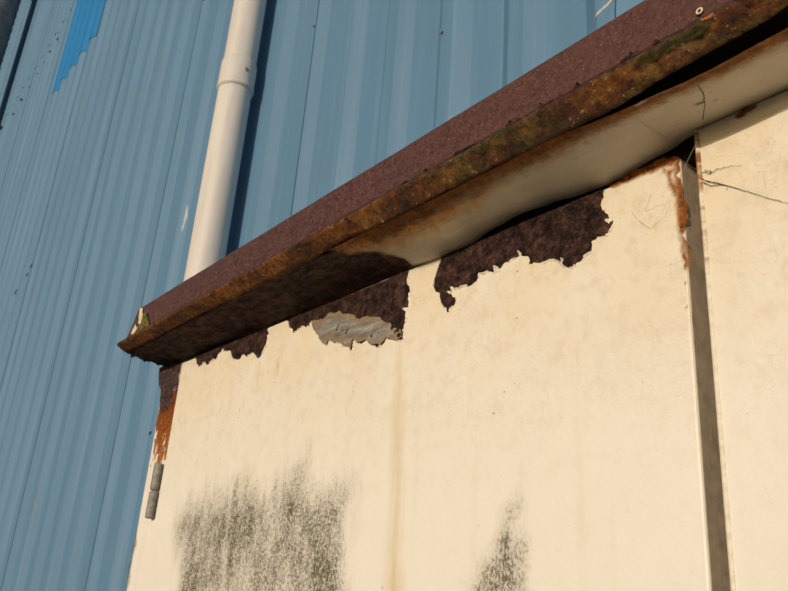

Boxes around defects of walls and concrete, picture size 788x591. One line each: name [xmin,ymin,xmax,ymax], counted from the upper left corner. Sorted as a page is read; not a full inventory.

rust [127,28,788,466]